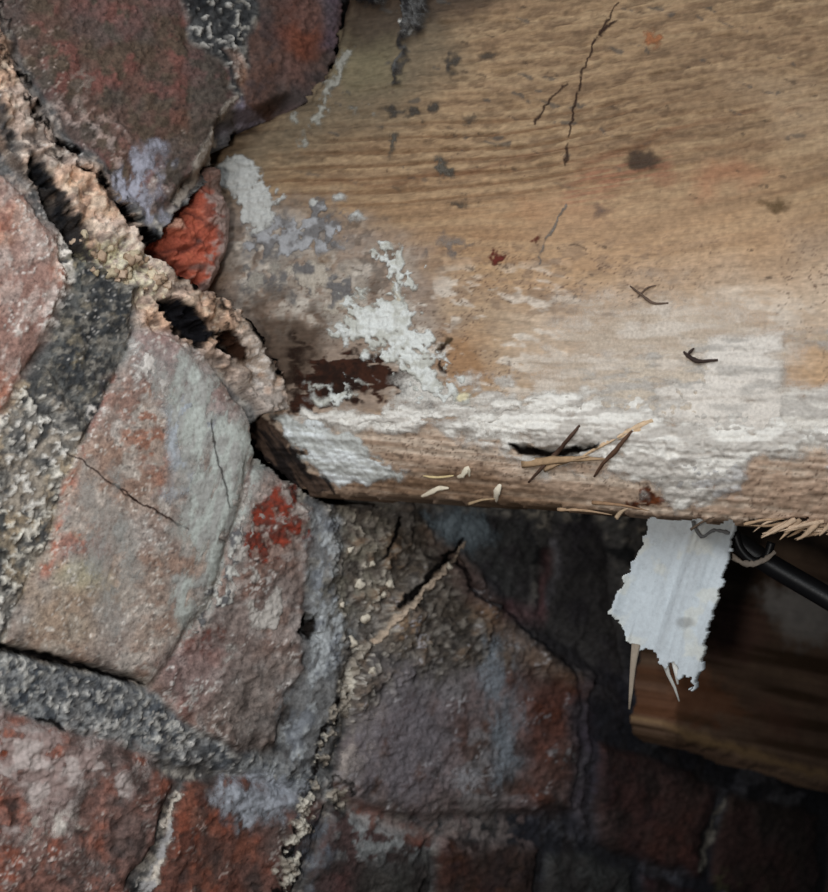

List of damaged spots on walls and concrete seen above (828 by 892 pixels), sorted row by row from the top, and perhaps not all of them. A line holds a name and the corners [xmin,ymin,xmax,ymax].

crack [0,1,160,247]
damp [217,95,239,120]
damp [310,50,351,125]
crack [171,267,282,378]
damp [173,127,828,510]
crack [211,419,230,507]
crack [378,516,402,561]
crack [397,538,464,609]
peeling [608,517,737,709]
crack [0,643,145,685]
crack [34,717,65,731]